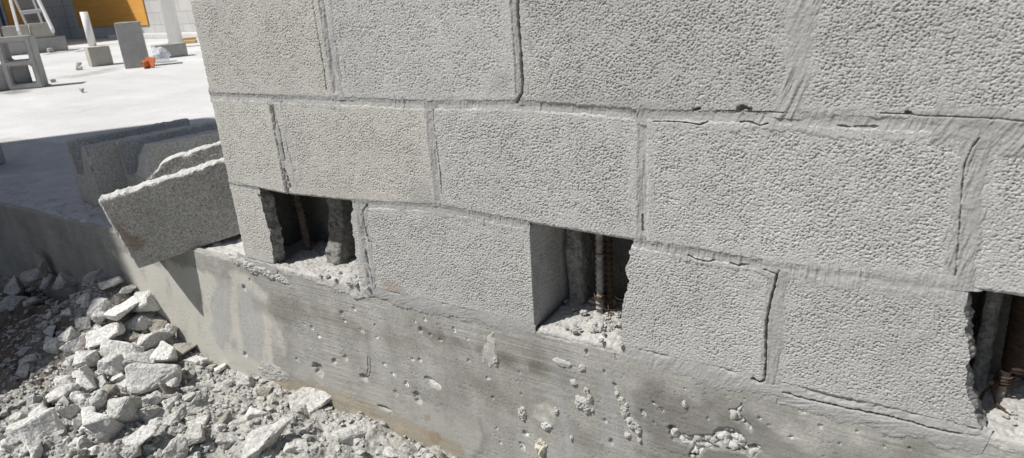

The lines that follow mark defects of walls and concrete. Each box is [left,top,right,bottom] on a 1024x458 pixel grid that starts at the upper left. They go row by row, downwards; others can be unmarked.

crack [654,110,774,126]
spalling [228,189,371,323]
spalling [538,229,627,359]
crack [837,113,993,271]
spalling [959,290,1024,454]